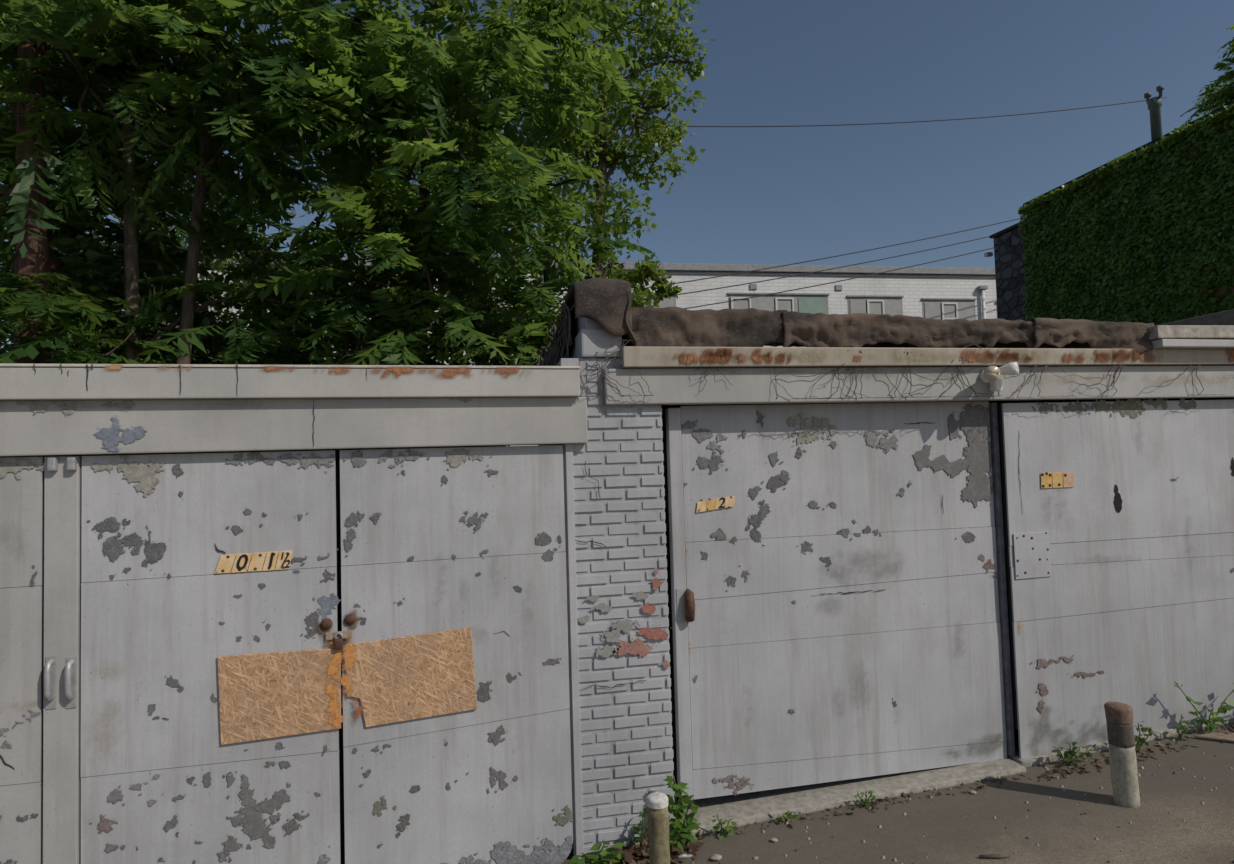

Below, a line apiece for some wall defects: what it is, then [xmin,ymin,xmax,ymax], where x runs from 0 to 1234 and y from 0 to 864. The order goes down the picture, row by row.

rust [374,367,469,378]
rust [674,348,791,364]
peeling [88,400,184,499]
peeling [711,412,838,546]
peeling [897,401,993,508]
peeling [87,516,171,580]
rust [316,612,363,729]
peeling [90,773,161,853]
peeling [163,771,310,862]
peeling [373,796,410,837]
peeling [487,767,518,793]
peeling [440,805,575,864]